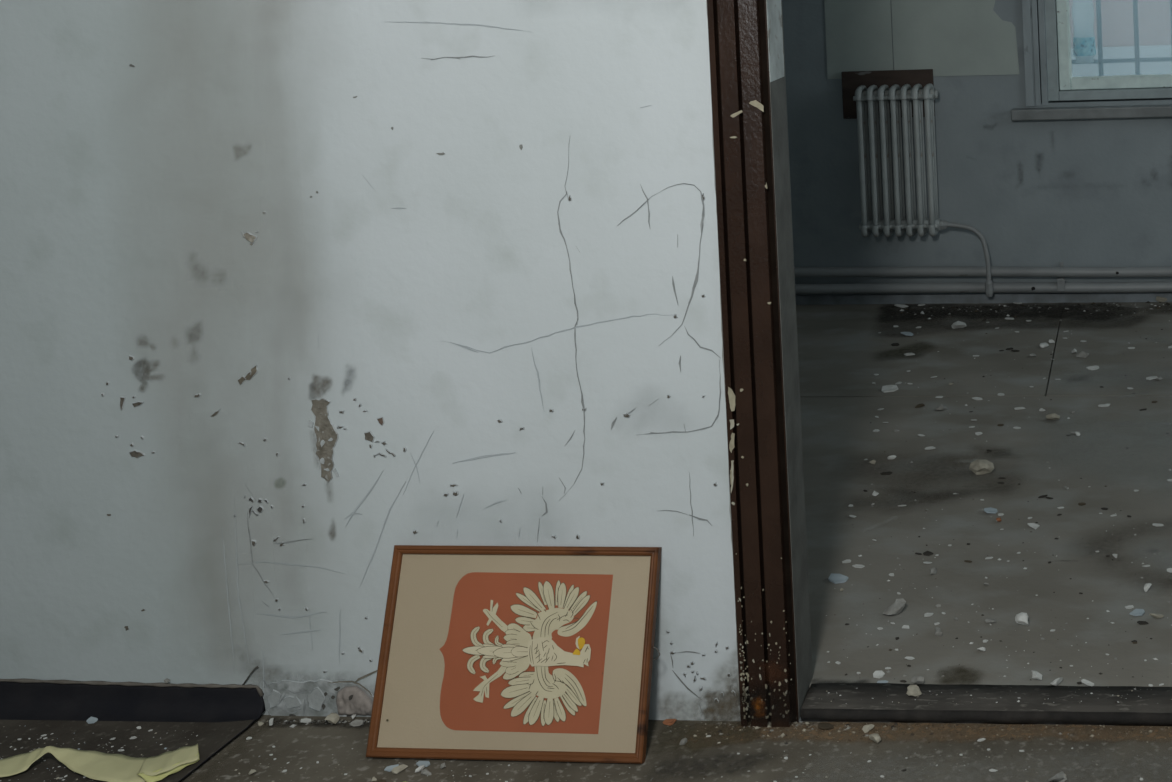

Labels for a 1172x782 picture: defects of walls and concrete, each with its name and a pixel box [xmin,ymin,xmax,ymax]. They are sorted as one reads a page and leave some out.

crack [443,139,721,491]
peeling [308,377,348,483]
peeling [353,398,407,458]
crack [660,475,712,536]